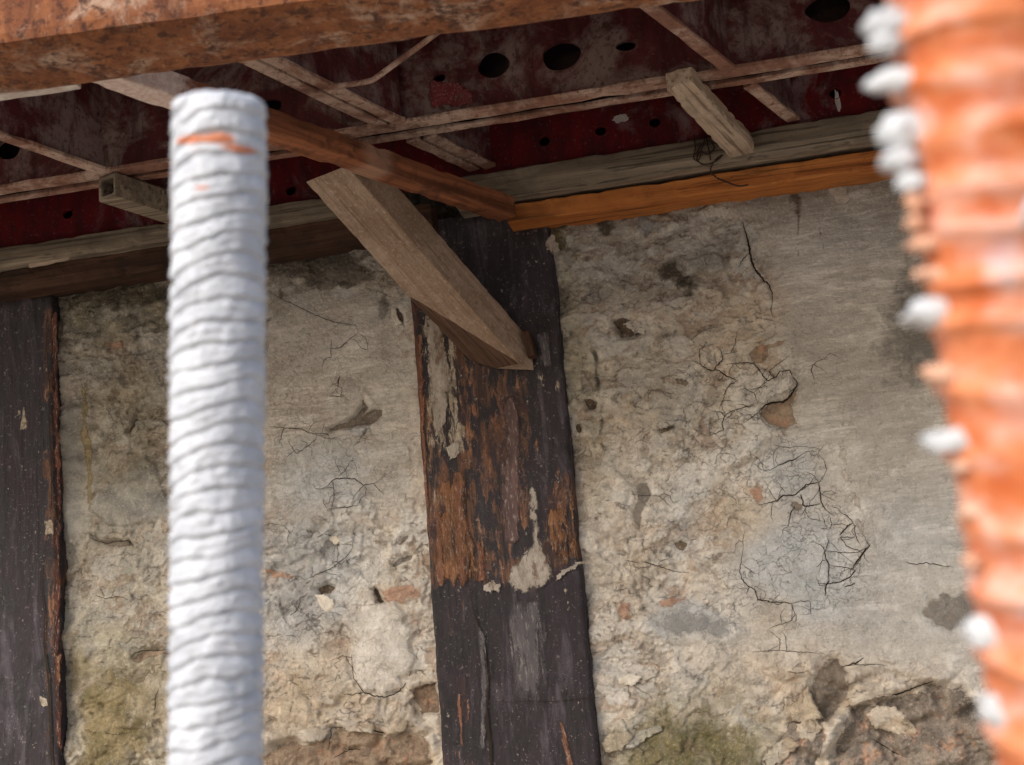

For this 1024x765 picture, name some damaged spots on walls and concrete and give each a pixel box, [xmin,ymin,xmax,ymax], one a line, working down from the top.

crack [740,222,773,317]
crack [268,291,385,509]
peeling [426,318,451,436]
peeling [446,440,460,459]
peeling [483,394,586,593]
crack [695,336,870,673]
spalling [762,659,997,765]